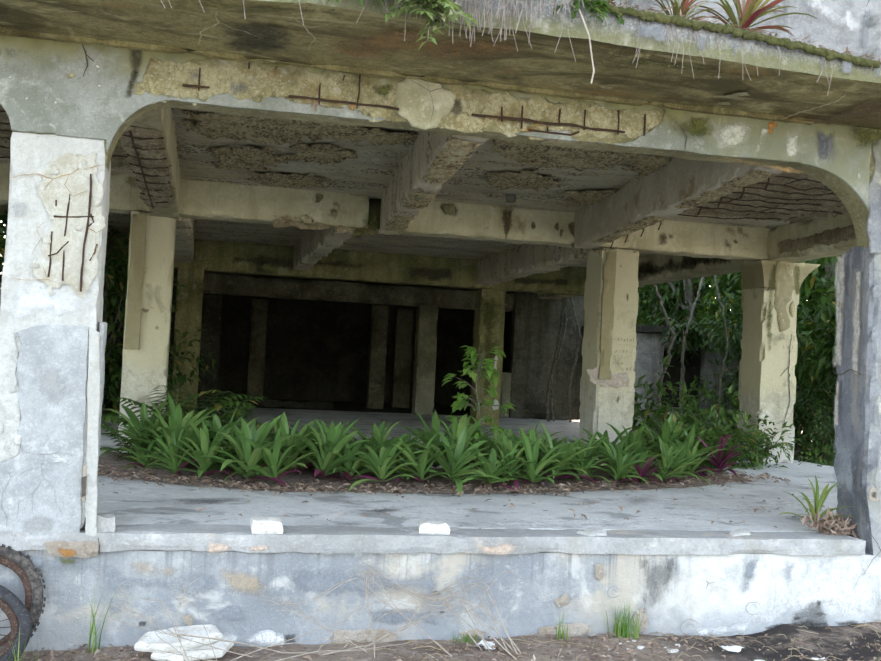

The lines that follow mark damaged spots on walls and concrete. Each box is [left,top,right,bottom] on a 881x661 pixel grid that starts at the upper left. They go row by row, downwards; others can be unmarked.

damp [227,24,287,51]
damp [639,24,668,41]
spalling [0,105,12,158]
spalling [111,58,419,209]
spalling [404,84,671,209]
spalling [32,151,105,298]
spalling [592,216,665,253]
spalling [674,170,856,332]
peeling [834,255,845,366]
damp [852,272,861,375]
crack [0,440,76,525]
damp [836,446,852,491]